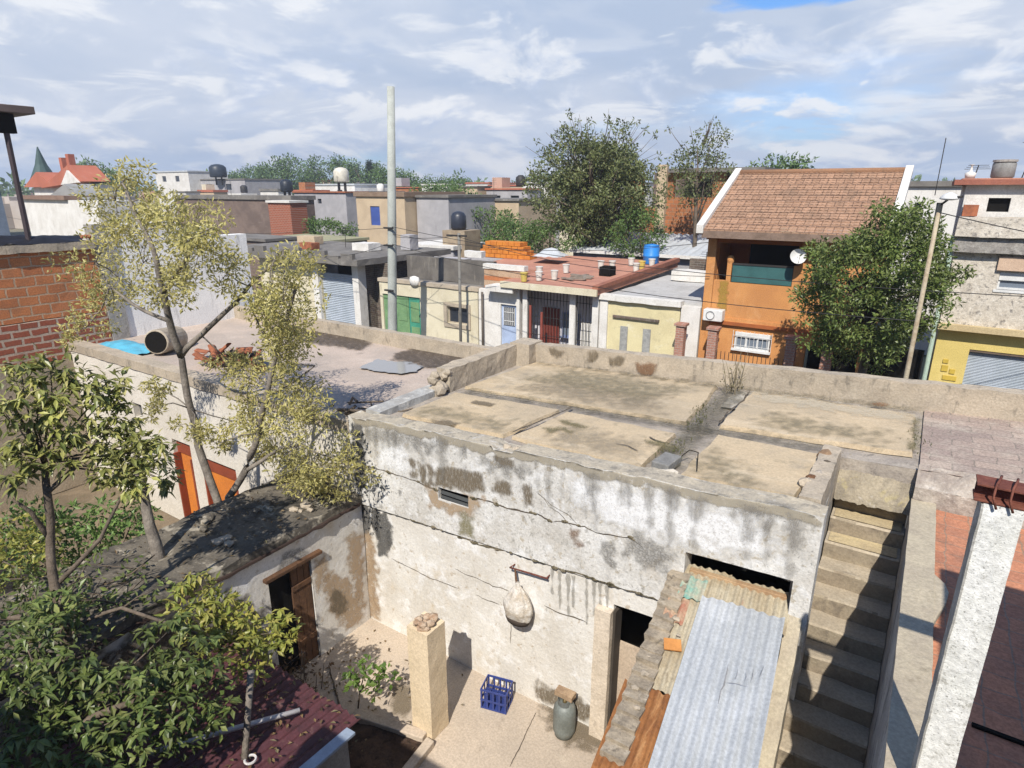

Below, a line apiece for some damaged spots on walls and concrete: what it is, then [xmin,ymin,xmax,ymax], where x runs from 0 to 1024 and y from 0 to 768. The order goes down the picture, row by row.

crack [364,464,438,491]
water stain [350,423,532,557]
crack [470,494,643,548]
water stain [602,535,671,572]
water stain [331,590,346,615]
water stain [551,569,609,624]